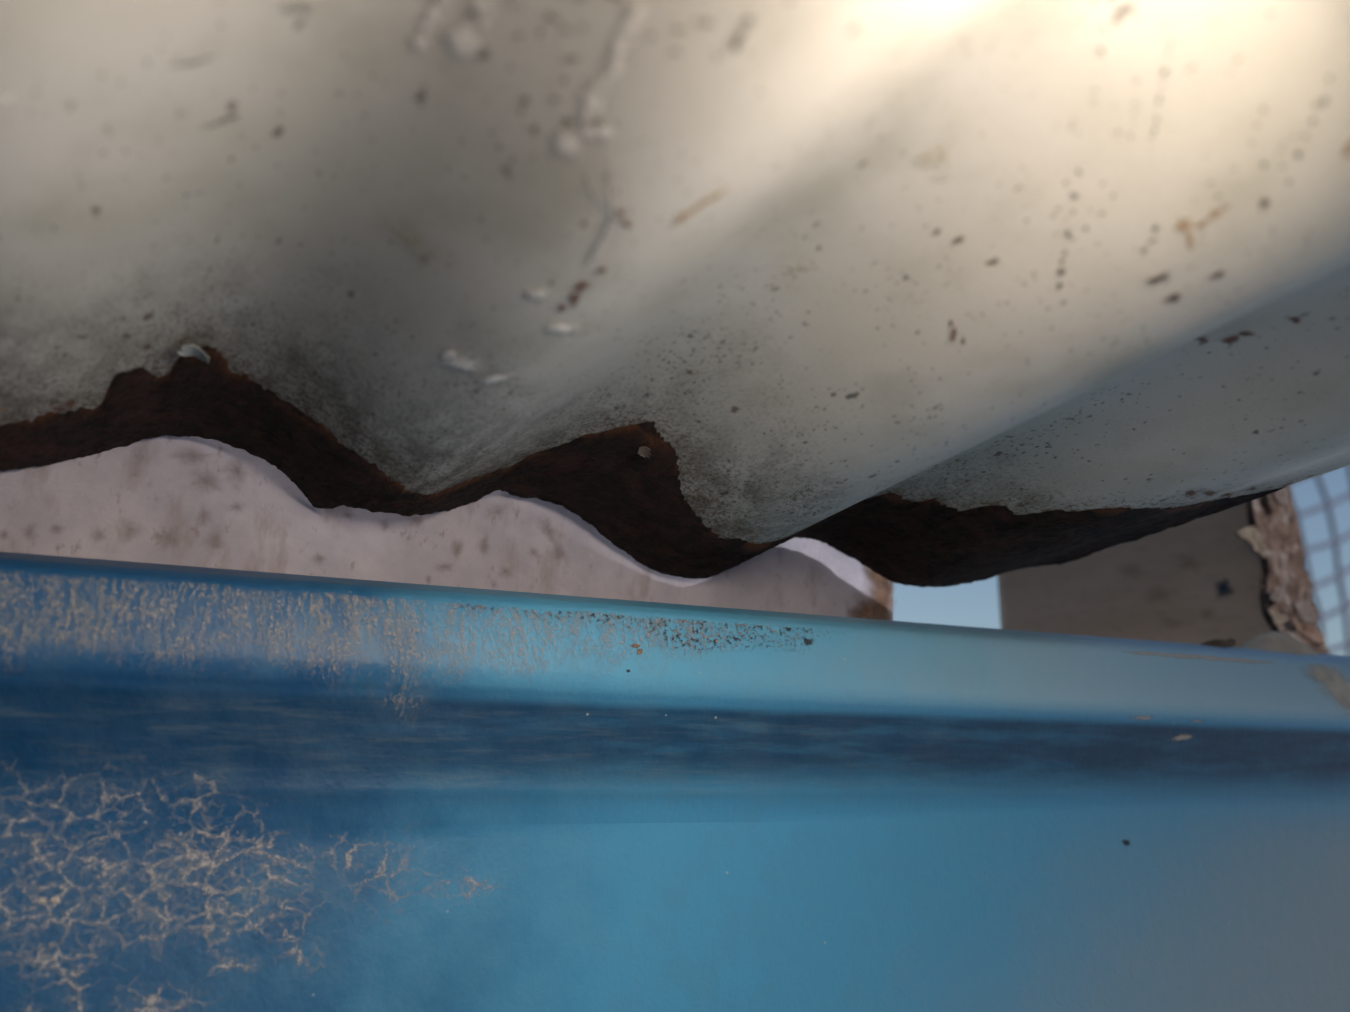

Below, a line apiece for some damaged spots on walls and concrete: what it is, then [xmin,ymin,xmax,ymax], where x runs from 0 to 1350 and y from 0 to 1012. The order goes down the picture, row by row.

corrosion [0,346,1285,620]
water stain [0,575,713,703]